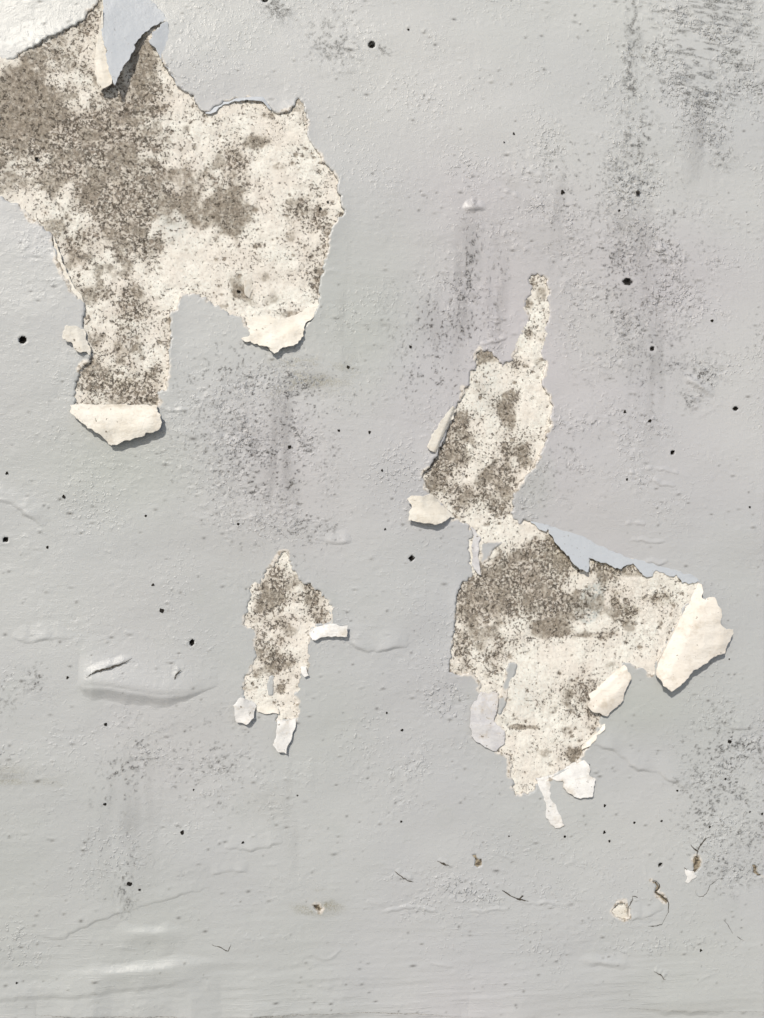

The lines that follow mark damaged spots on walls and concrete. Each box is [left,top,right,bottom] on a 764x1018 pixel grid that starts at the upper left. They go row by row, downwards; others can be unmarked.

peeling [0,0,344,445]
peeling [233,552,348,754]
peeling [407,274,734,828]